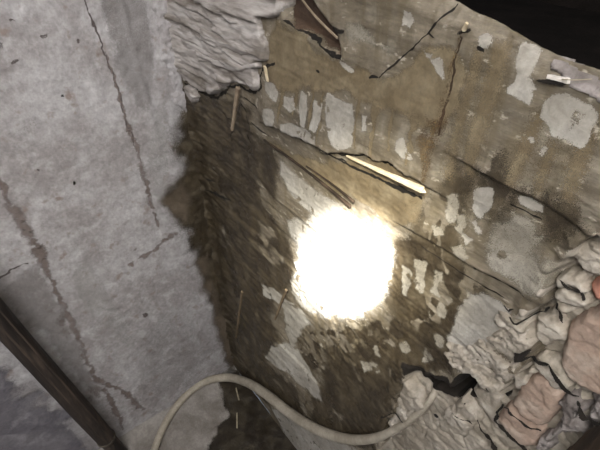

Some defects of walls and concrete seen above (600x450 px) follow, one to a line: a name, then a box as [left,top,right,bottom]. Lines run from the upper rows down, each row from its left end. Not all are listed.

spalling [283,0,390,73]
crack [369,4,458,79]
crack [84,0,160,228]
corrosion [414,36,463,183]
crack [318,148,422,200]
damp [127,38,600,434]
damp [0,177,145,430]
crack [422,246,550,325]
spalling [379,187,600,450]
damp [0,363,99,450]
damp [207,382,297,450]